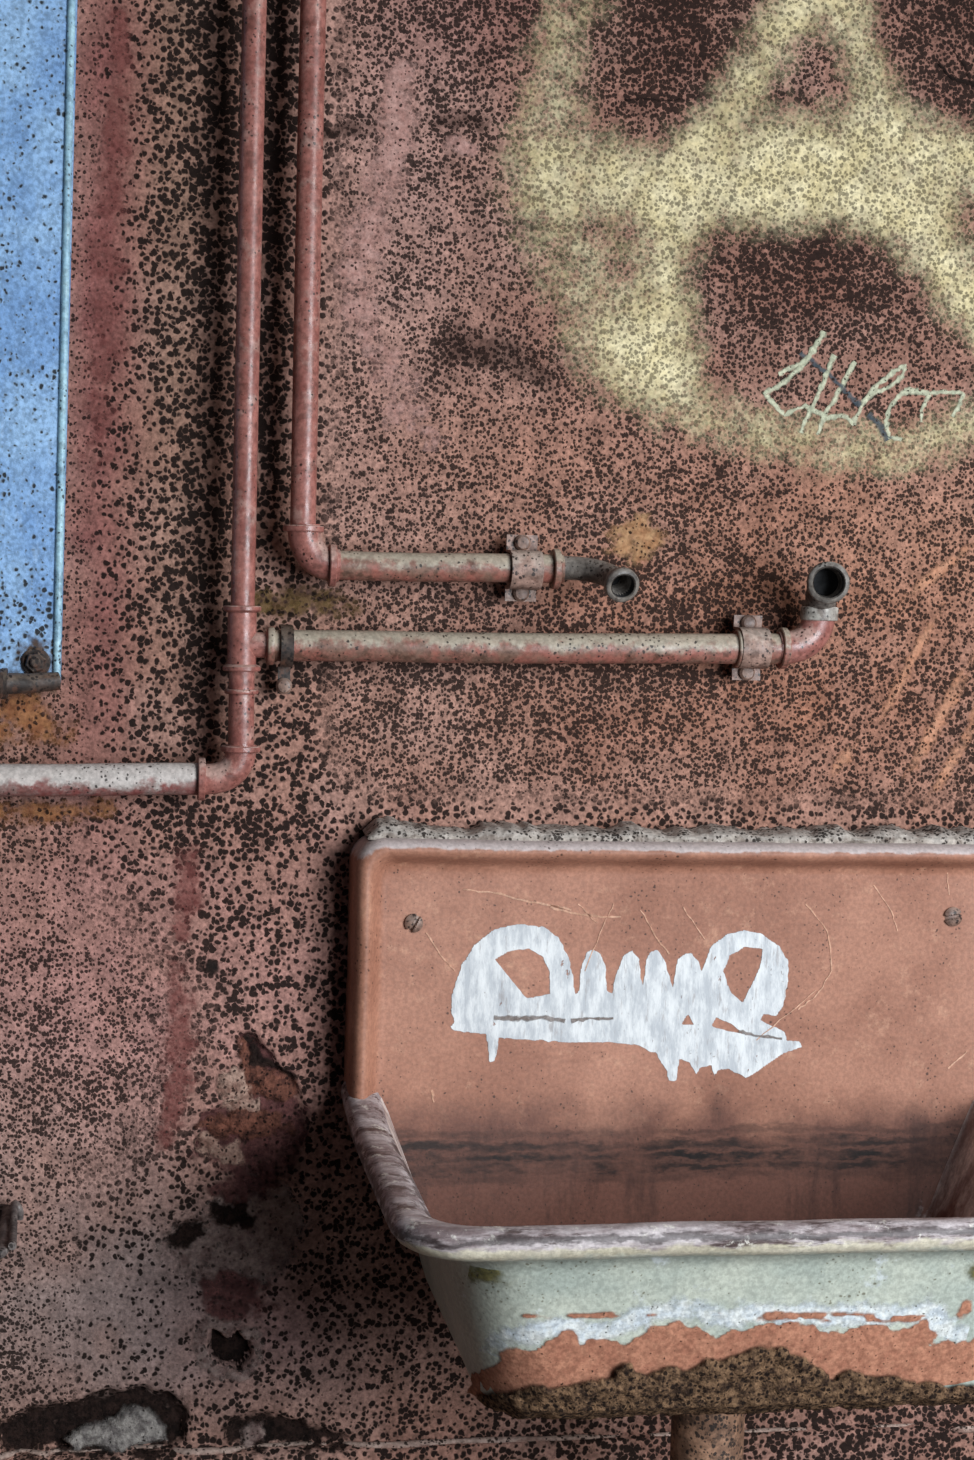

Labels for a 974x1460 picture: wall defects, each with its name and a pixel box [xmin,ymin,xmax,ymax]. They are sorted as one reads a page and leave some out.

rust [609,514,663,561]
rust [0,694,67,740]
flaking render [156,1032,312,1382]
flaking render [0,1386,189,1460]